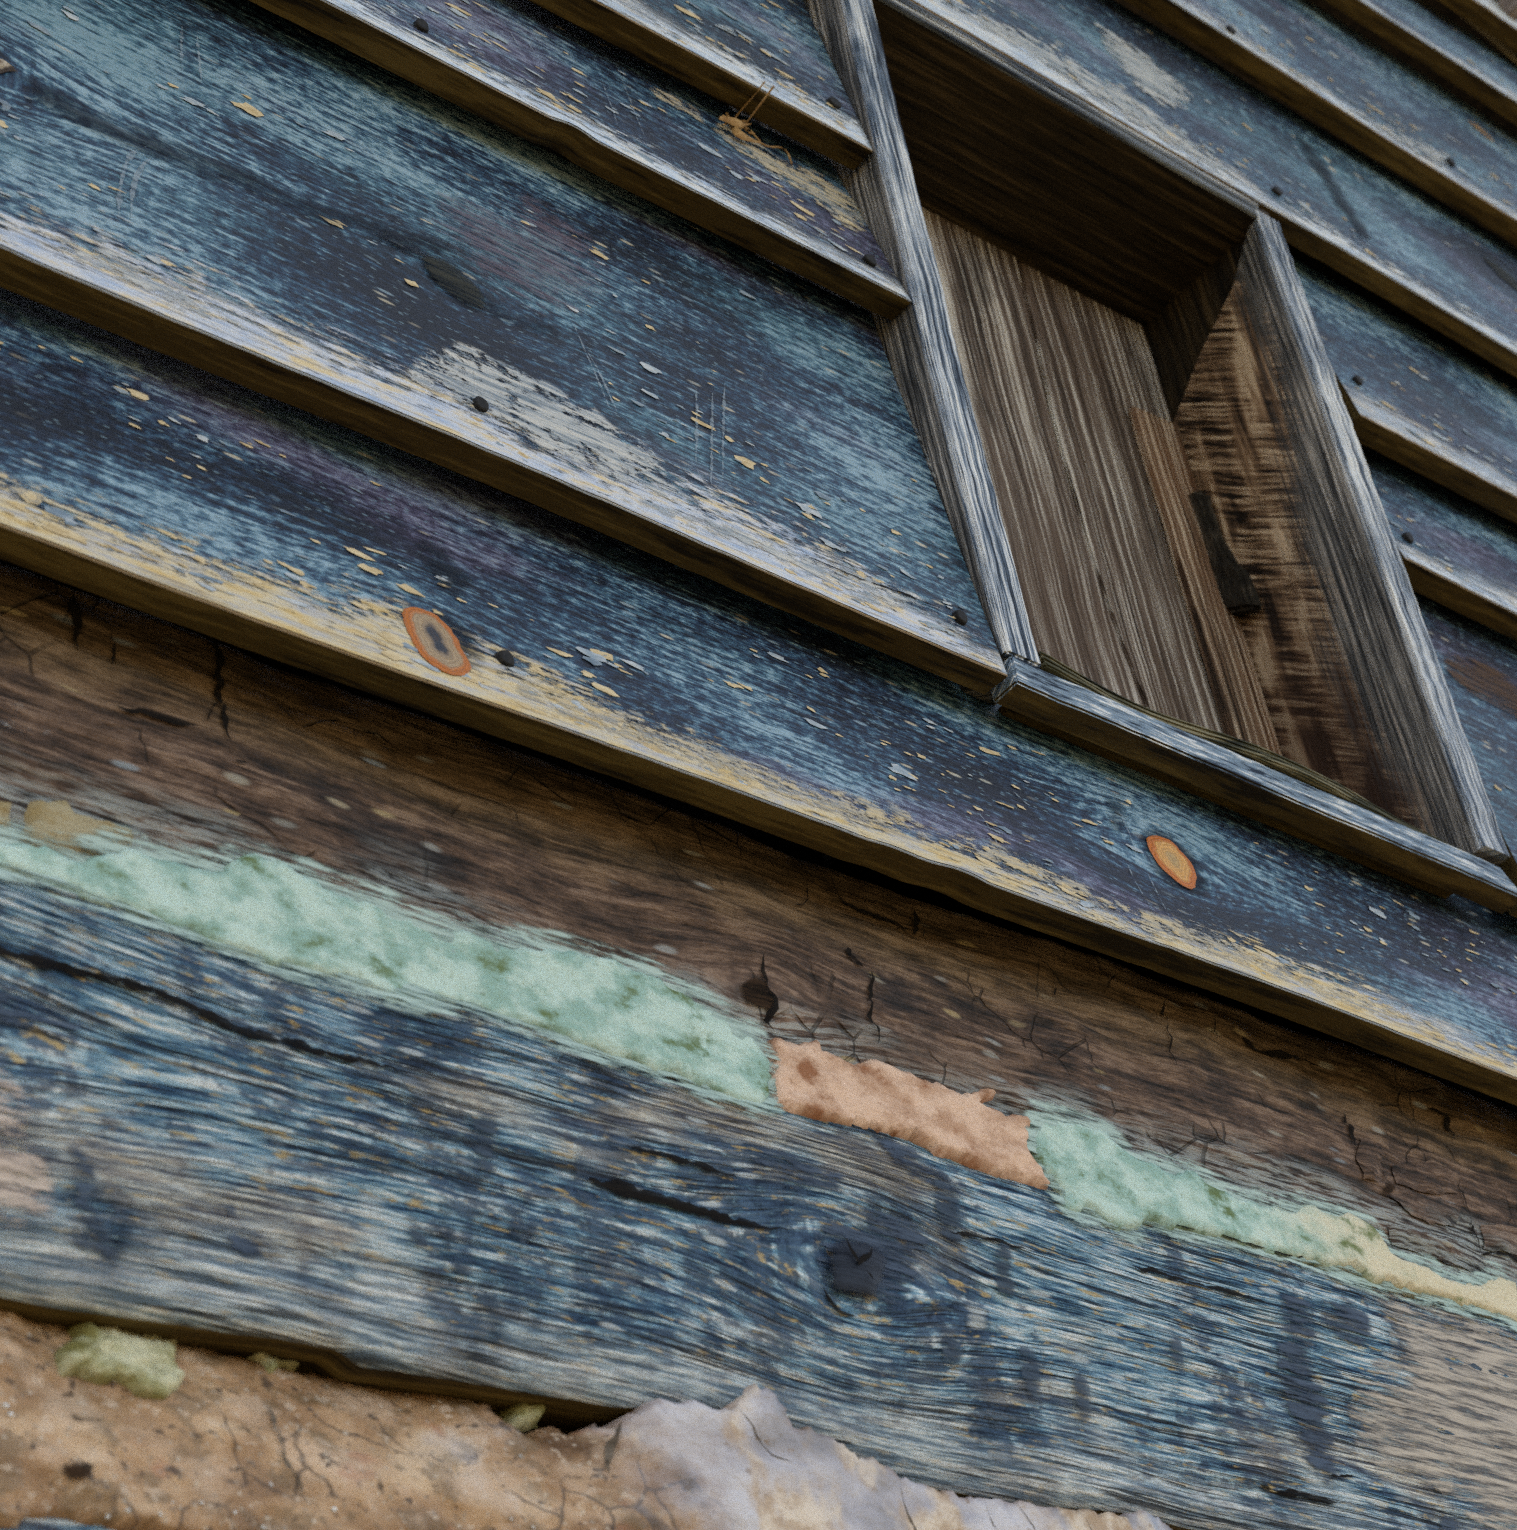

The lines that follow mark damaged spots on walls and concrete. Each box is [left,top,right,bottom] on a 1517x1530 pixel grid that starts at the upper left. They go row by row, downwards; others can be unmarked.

peeling [156,82,220,117]
peeling [231,94,264,117]
peeling [295,121,354,152]
peeling [0,183,1002,670]
peeling [1355,356,1517,496]
crack [69,596,116,664]
crack [116,637,247,763]
peeling [0,472,1517,1077]
crack [605,1419,622,1474]
crack [744,1414,793,1463]
crack [901,1489,917,1530]
crack [1259,1474,1356,1505]